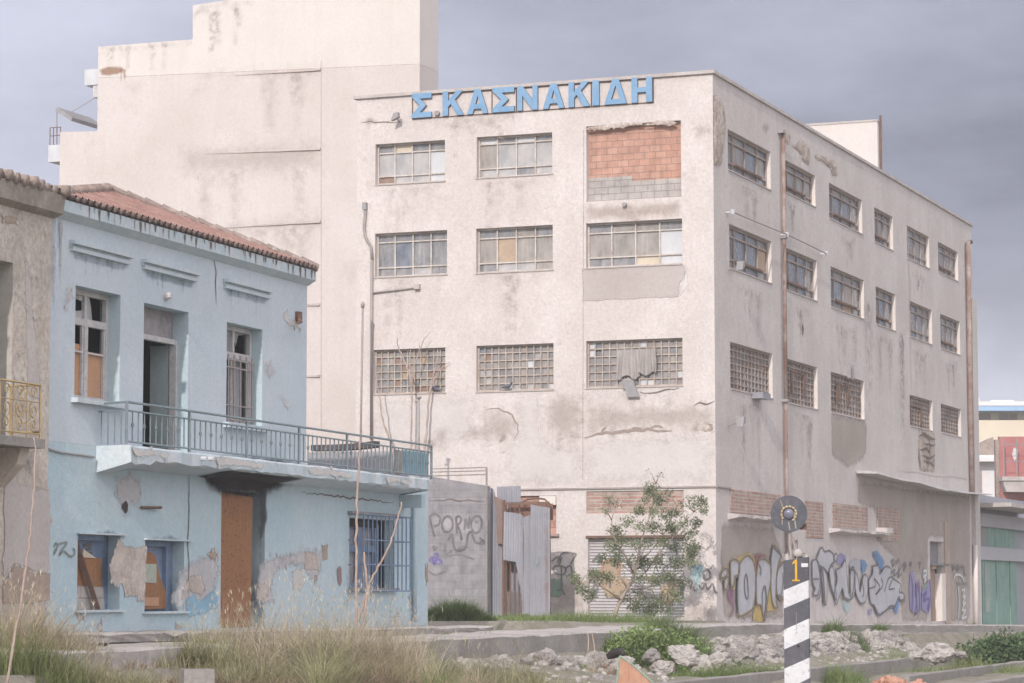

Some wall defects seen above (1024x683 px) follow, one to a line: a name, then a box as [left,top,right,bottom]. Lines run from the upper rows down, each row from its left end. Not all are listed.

spalling [586,120,683,131]
spalling [792,139,837,176]
crack [486,408,519,440]
crack [584,425,671,438]
peeling [214,455,264,469]
crack [303,491,393,503]
peeling [3,564,52,606]
peeling [109,539,147,602]
peeling [172,547,219,610]
peeling [256,544,329,607]